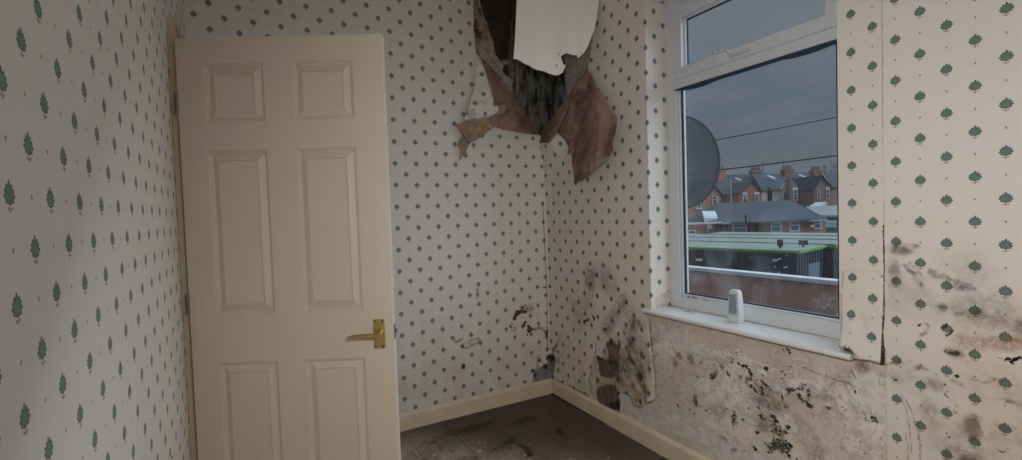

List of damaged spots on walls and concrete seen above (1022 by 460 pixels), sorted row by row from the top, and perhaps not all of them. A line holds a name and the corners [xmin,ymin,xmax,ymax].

spalling [473,0,516,91]
flaking render [563,32,594,102]
water stain [509,304,544,336]
water stain [674,352,814,460]
flaking render [616,314,887,460]